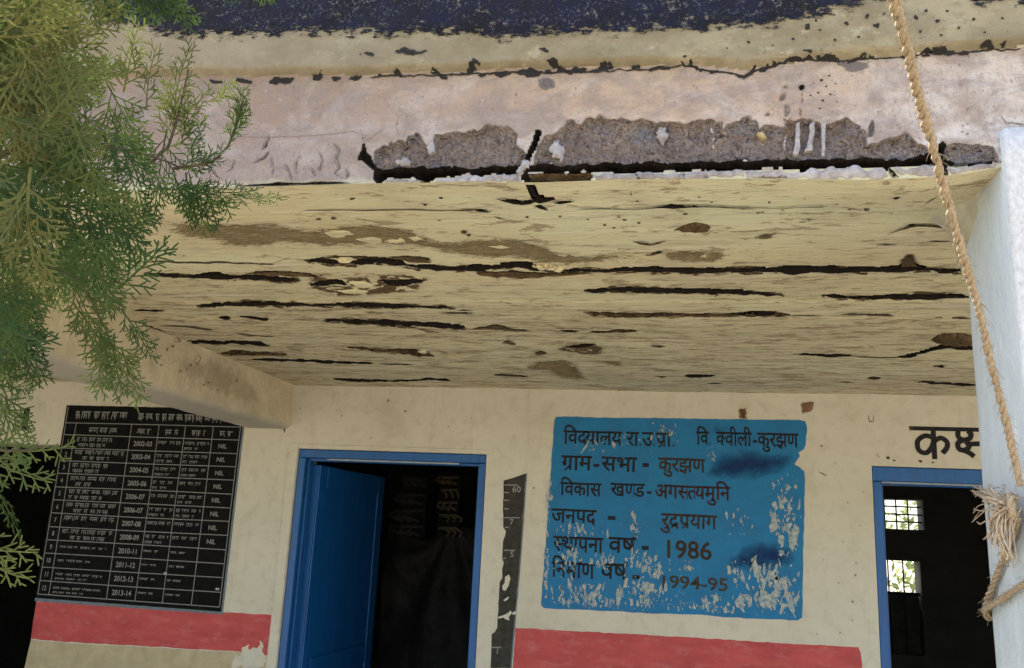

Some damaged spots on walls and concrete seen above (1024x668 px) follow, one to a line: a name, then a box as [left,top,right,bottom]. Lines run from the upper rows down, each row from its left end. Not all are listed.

crack [227,116,1002,220]
spalling [374,115,999,183]
peeling [170,223,634,267]
peeling [674,222,711,233]
peeling [665,250,729,263]
flaking render [310,273,430,296]
peeling [527,328,638,380]
peeling [574,423,679,453]
peeling [543,474,802,618]
peeling [232,641,267,668]